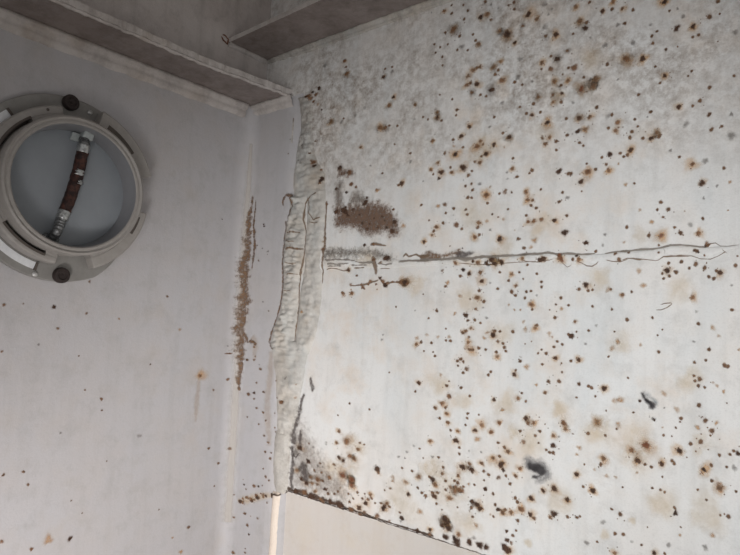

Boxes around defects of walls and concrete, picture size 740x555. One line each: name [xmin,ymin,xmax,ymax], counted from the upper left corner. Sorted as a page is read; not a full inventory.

rust [326,165,405,247]
rust [341,256,409,298]
rust [403,241,463,293]
crack [269,192,734,349]
rust [647,220,718,281]
rust [225,196,267,425]
rust [686,403,720,458]
rust [287,462,489,555]
rust [411,446,490,510]
rust [468,492,522,554]